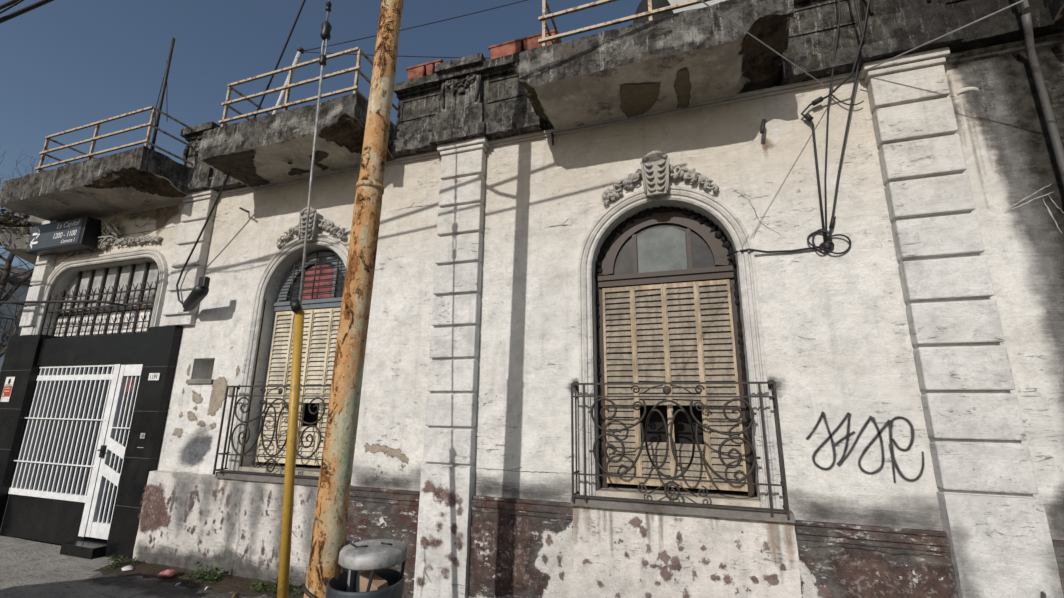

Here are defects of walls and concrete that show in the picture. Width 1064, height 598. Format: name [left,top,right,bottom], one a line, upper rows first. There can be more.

spalling [739,14,794,83]
spalling [288,113,365,176]
spalling [84,167,186,198]
damp [953,33,1064,386]
peeling [172,366,240,438]
damp [181,429,212,465]
peeling [139,483,313,573]
damp [305,487,318,550]
peeling [417,481,591,598]
peeling [614,516,786,598]
peeling [799,548,959,598]
damp [1048,491,1064,540]